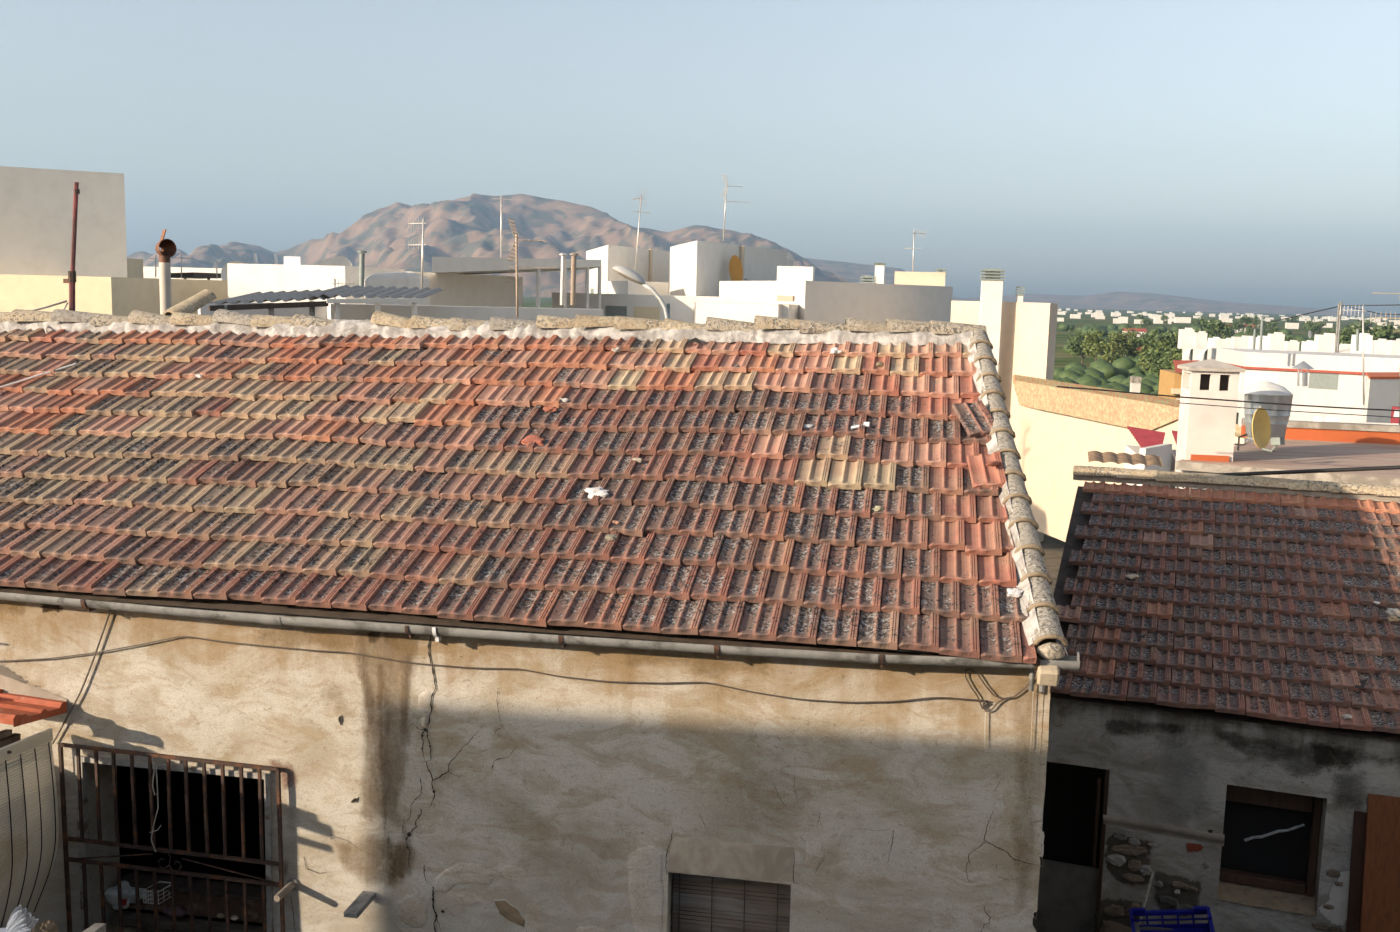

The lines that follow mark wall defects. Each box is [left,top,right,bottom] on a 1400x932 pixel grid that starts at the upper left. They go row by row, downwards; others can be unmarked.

damp [363,631,415,813]
crack [402,635,517,932]
flaking render [493,899,527,929]
crack [966,778,1041,932]